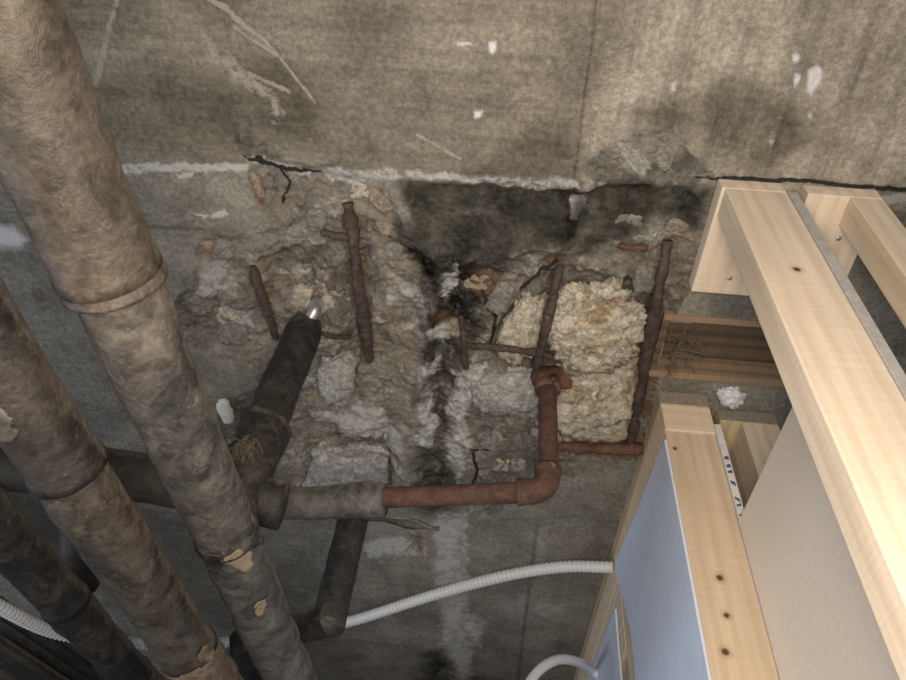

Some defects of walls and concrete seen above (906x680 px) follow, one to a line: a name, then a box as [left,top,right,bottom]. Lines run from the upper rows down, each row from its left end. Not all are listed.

crack [243,155,321,203]
crack [695,175,906,192]
water stain [122,156,705,481]
spalling [173,115,715,487]
water stain [363,512,487,680]